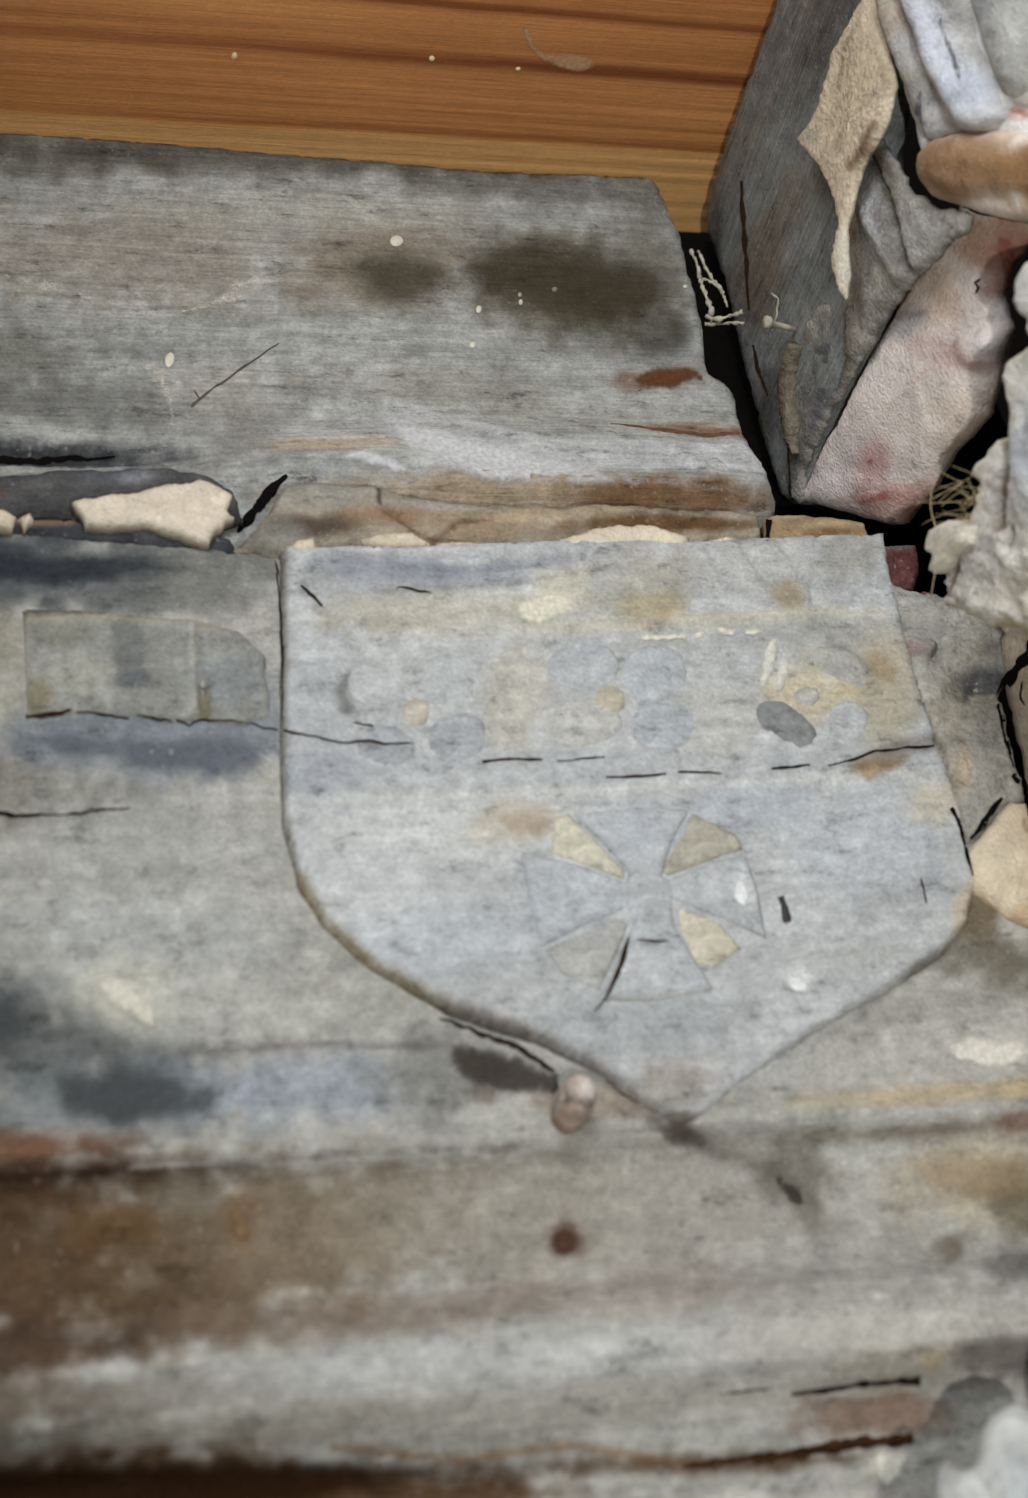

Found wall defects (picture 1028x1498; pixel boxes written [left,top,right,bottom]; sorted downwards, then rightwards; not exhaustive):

rust [637,368,702,387]
crack [0,455,115,465]
peeling [71,479,234,551]
crack [0,807,130,818]
leakage [0,1463,427,1498]